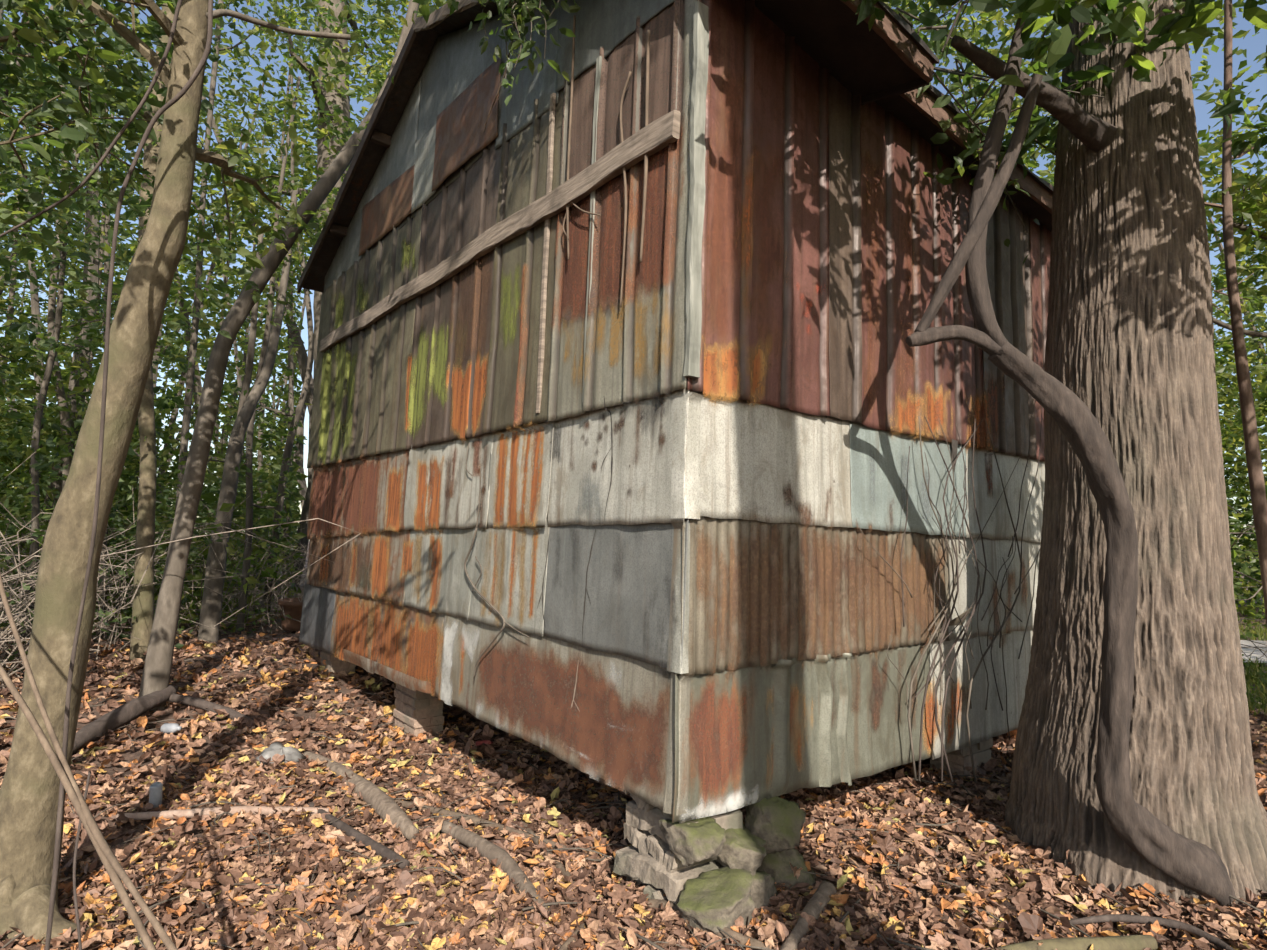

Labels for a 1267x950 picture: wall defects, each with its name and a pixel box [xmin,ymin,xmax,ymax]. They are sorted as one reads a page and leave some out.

rust [309,253,544,696]
rust [897,386,945,438]
rust [479,643,670,793]
rust [689,484,946,801]